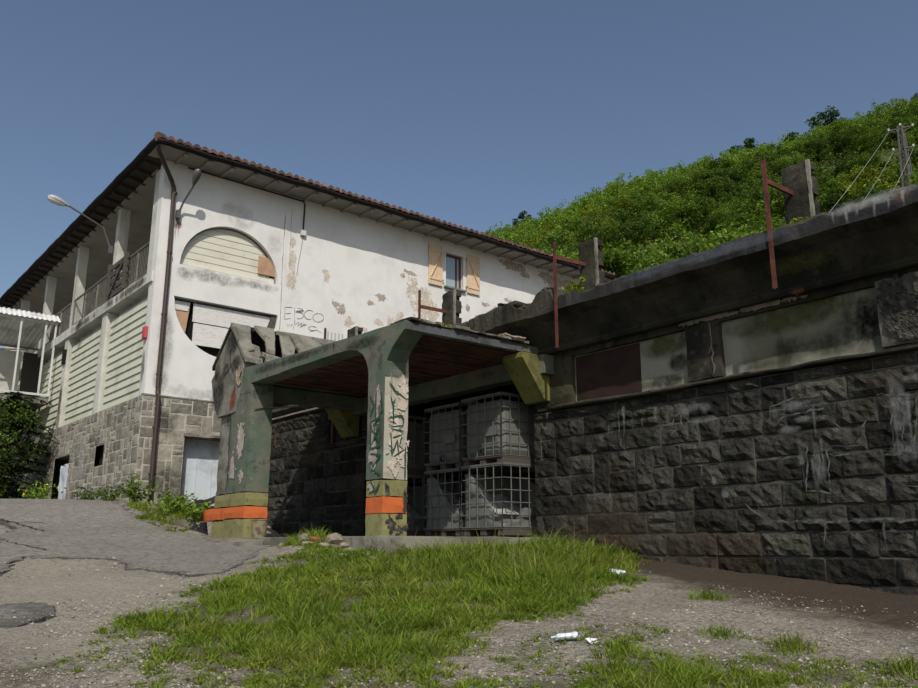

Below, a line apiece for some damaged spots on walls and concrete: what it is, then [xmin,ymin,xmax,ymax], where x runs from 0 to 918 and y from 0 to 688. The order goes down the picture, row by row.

peeling [332,269,440,333]
peeling [228,411,246,483]